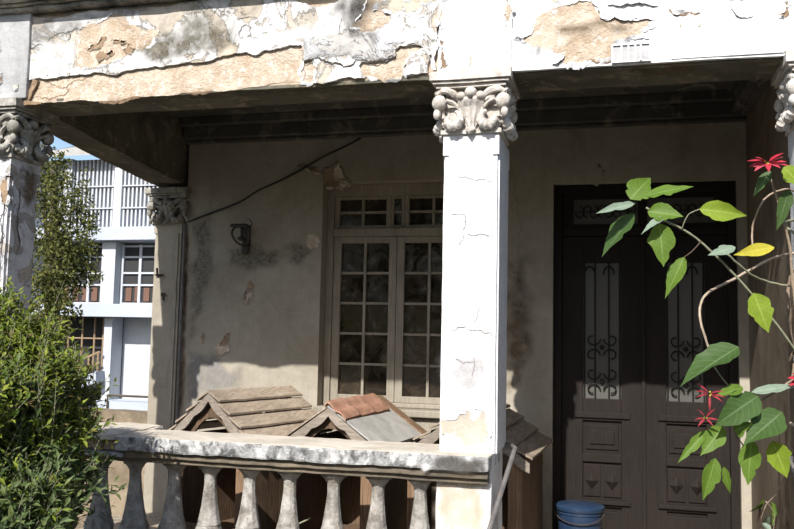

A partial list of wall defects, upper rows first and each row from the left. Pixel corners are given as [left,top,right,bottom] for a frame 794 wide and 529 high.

peeling [349,0,392,35]
flaking render [403,0,450,71]
peeling [498,0,664,70]
flaking render [779,0,792,17]
flaking render [23,13,318,107]
flaking render [360,45,423,83]
crack [0,189,21,271]
crack [454,213,491,247]
peeling [440,410,492,446]